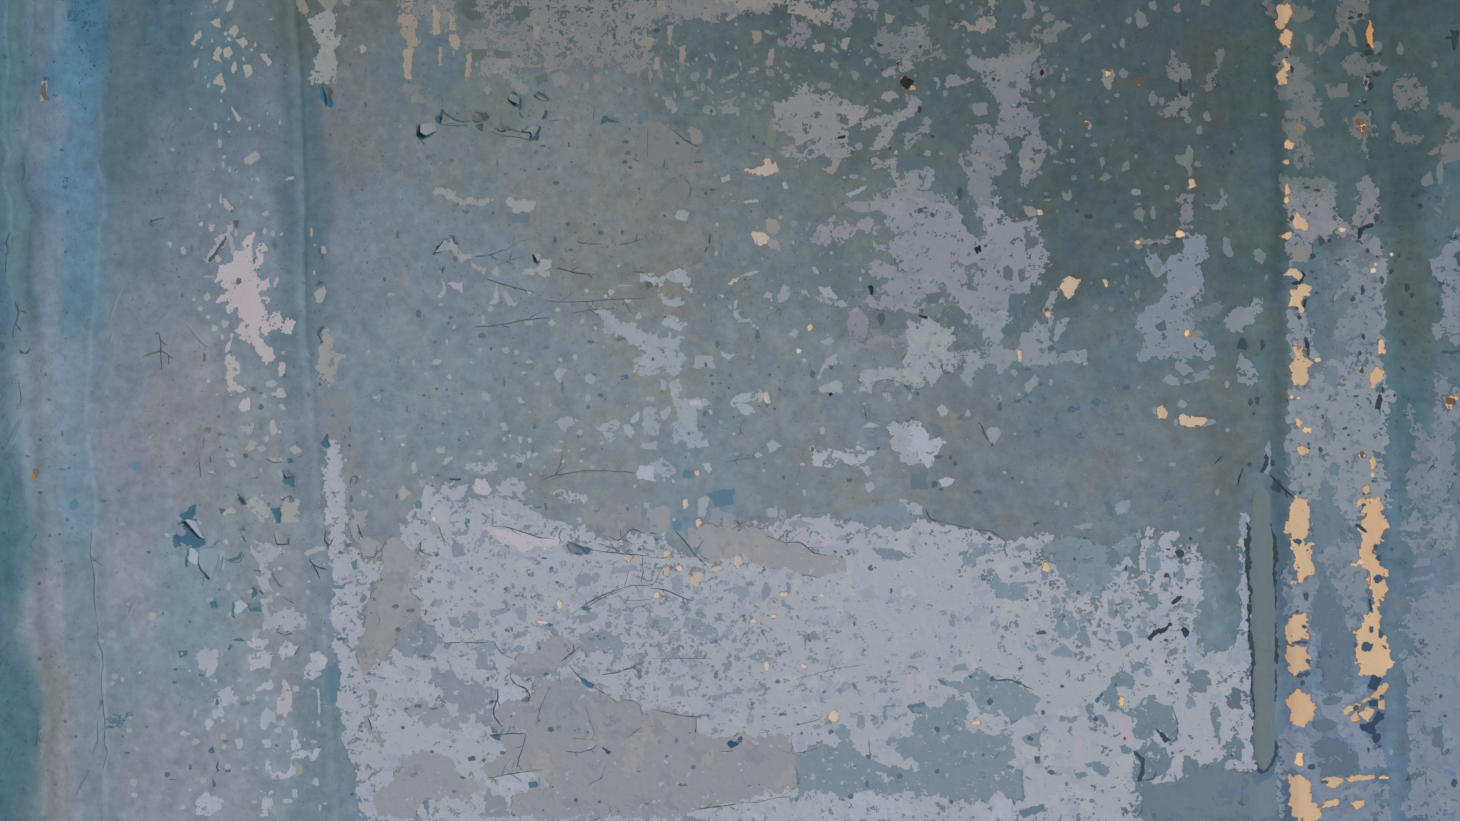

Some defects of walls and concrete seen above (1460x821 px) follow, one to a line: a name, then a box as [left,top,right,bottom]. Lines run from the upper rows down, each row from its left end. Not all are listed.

peeling [1260,1,1294,85]
spalling [881,62,922,113]
spalling [1343,43,1383,134]
peeling [704,158,788,195]
peeling [1282,139,1306,165]
peeling [191,198,302,467]
peeling [234,183,1460,821]
peeling [187,548,199,564]
peeling [195,647,238,730]
peeling [195,769,231,816]